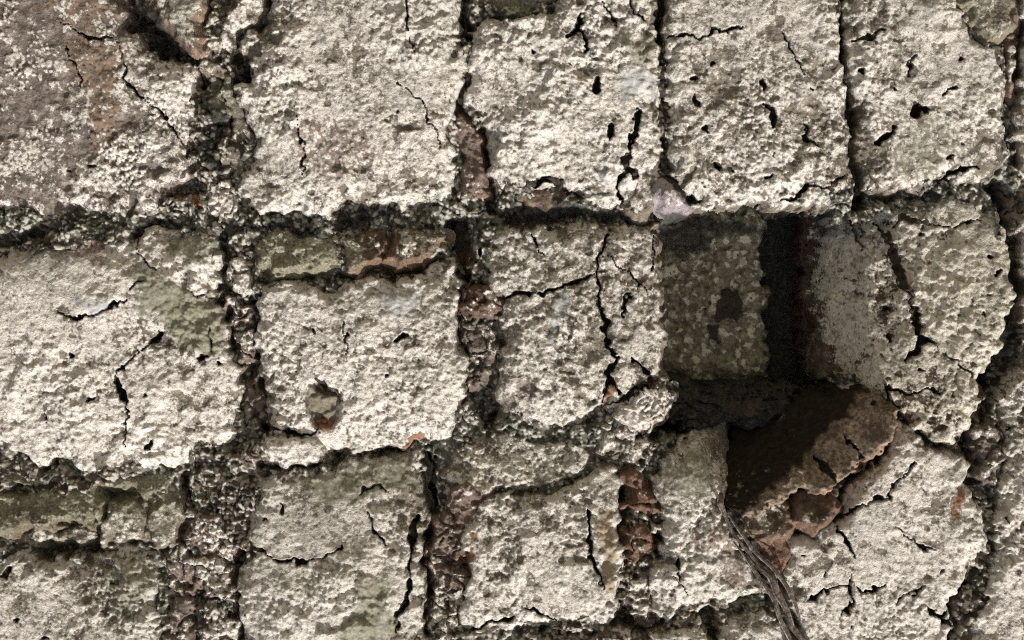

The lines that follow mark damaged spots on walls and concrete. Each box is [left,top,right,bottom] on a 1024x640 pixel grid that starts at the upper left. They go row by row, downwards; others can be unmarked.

crack [122,65,191,159]
peeling [255,227,456,284]
crack [505,234,658,403]
damp [658,214,761,258]
damp [707,289,743,344]
damp [780,205,821,386]
crack [856,166,975,361]
crack [114,366,130,436]
spalling [305,378,340,432]
crack [586,509,604,585]
peeling [741,488,843,574]
crack [807,462,989,637]